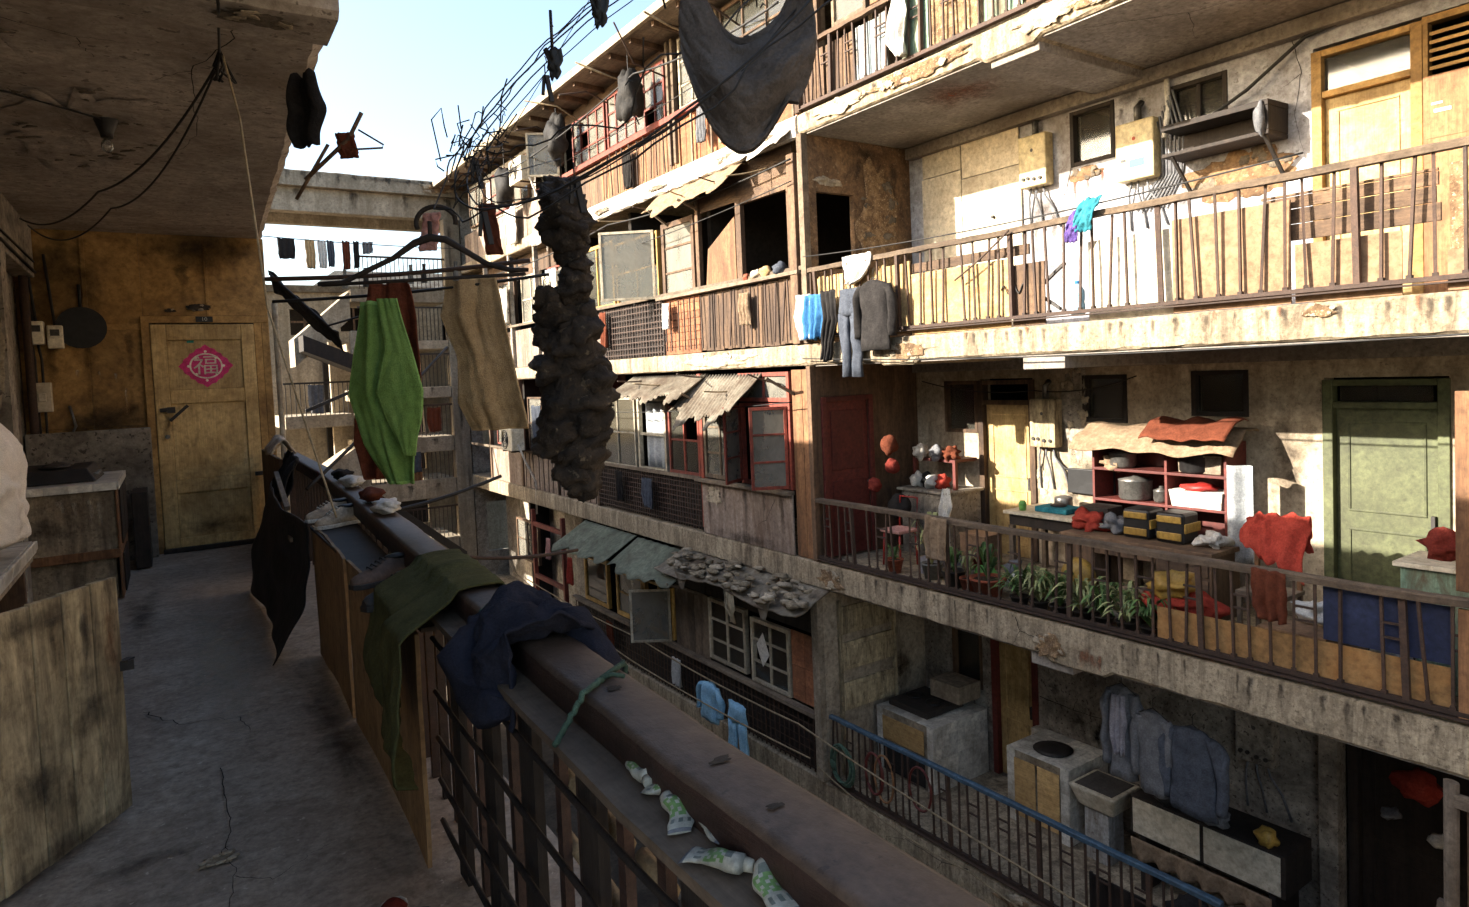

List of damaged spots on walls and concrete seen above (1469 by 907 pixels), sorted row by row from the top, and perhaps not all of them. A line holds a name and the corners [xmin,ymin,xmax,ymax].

peeling [1010,0,1102,35]
crack [220,768,324,907]